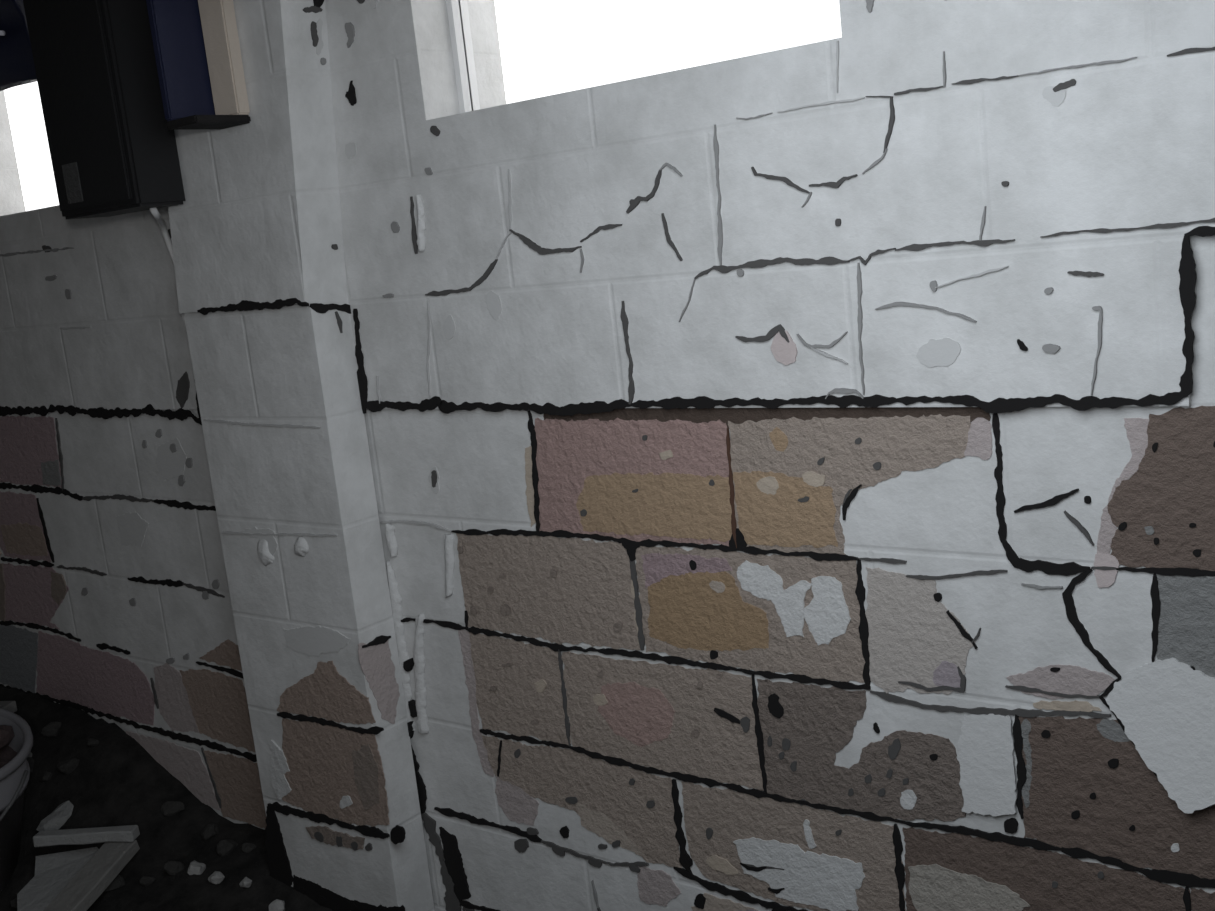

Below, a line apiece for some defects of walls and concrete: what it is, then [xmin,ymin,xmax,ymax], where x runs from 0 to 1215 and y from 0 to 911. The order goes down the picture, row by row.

crack [0,247,74,257]
peeling [0,416,62,488]
spalling [142,429,193,486]
crack [0,379,337,598]
crack [196,125,1215,911]
crack [0,620,131,655]
spalling [456,406,1215,911]
crack [0,678,257,808]
peeling [0,563,406,911]